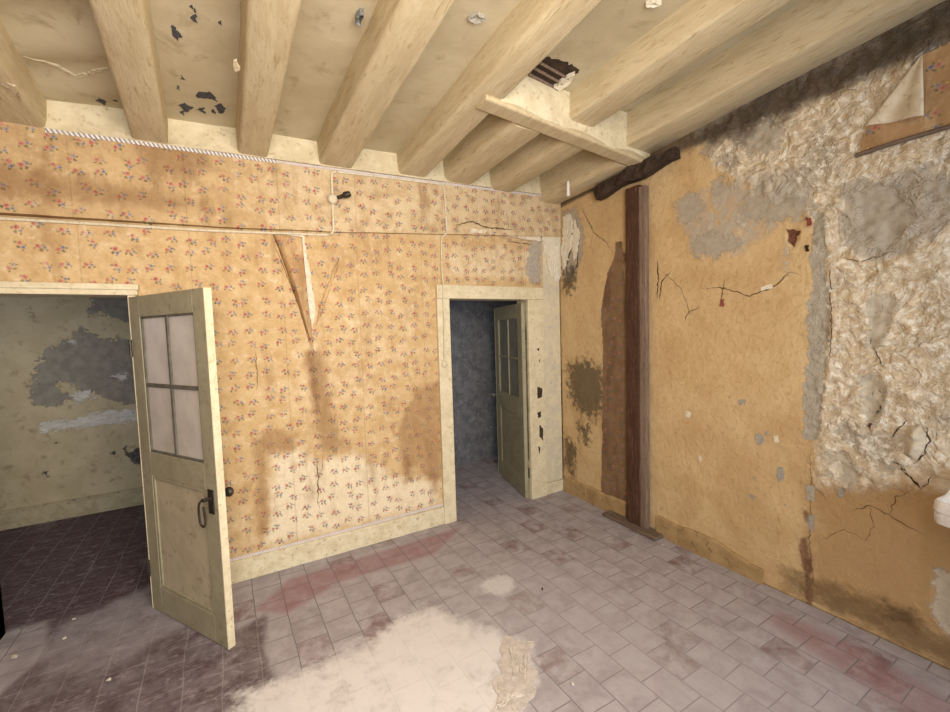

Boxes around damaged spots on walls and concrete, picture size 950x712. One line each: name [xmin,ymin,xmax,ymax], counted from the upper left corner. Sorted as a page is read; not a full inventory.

peeling [178,92,226,116]
flaking render [731,114,784,160]
flaking render [673,191,748,261]
peeling [273,234,339,352]
crack [657,262,799,320]
peeling [26,297,137,444]
flaking render [859,294,898,431]
water stain [562,357,603,477]
peeling [110,446,141,464]
crack [826,461,931,539]
flaking render [930,567,950,635]